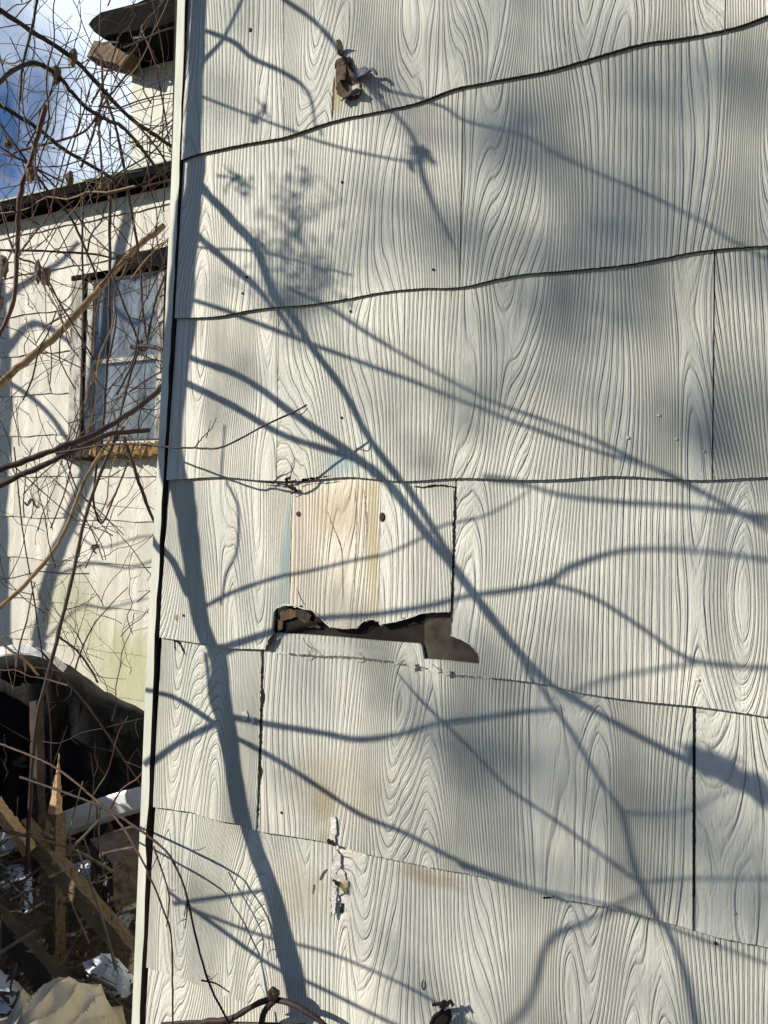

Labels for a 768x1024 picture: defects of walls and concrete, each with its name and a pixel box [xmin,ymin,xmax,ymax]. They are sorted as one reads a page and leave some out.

spalling [274,604,489,678]
crack [256,632,277,829]
spalling [312,816,349,918]